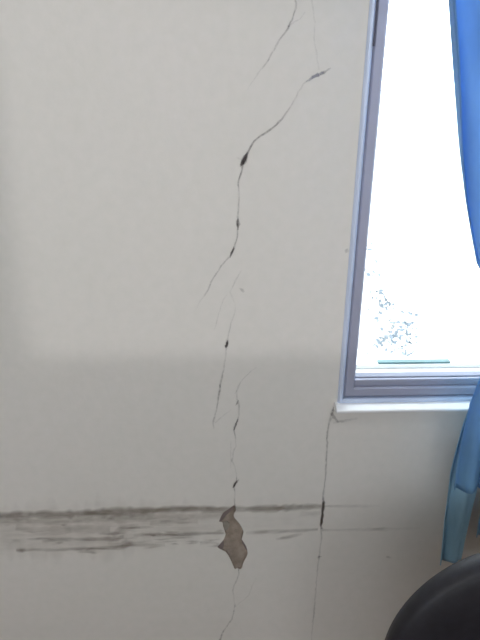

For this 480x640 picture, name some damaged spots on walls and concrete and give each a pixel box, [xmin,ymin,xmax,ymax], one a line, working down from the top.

flaking render [218,506,248,569]